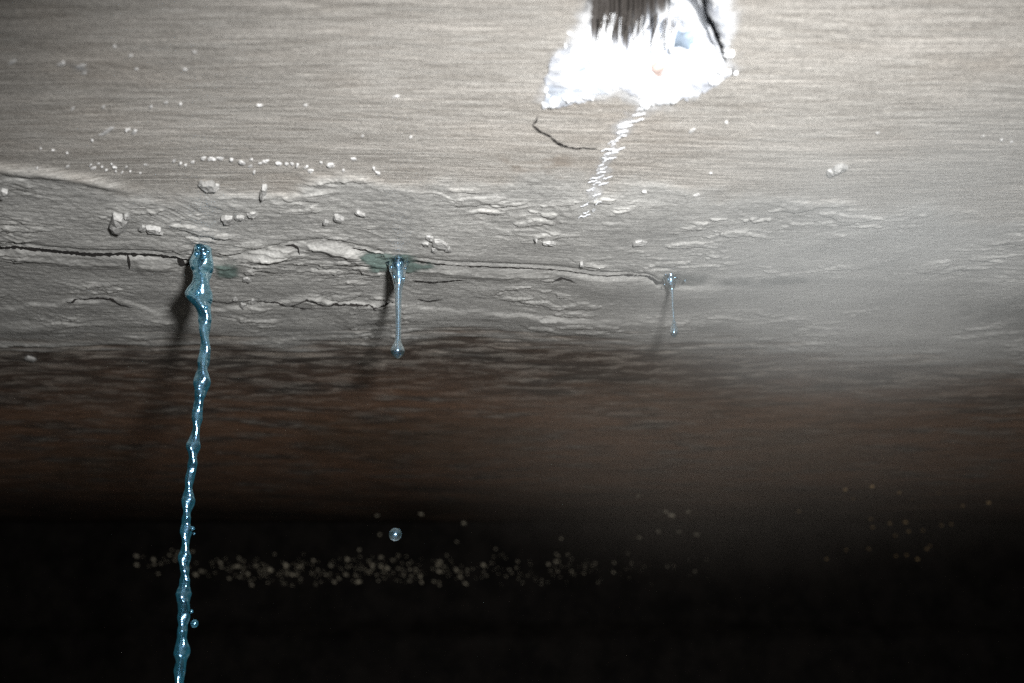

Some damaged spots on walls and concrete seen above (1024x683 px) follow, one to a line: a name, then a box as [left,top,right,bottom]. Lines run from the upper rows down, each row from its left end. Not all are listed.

crack [533,116,597,149]
efflorescence [579,108,645,218]
peeling [198,179,220,193]
peeling [221,184,268,225]
peeling [109,212,163,235]
peeling [322,211,367,226]
peeling [422,235,452,253]
crack [0,245,190,269]
crack [215,260,664,310]
crack [67,297,133,308]
leakage [134,244,644,683]